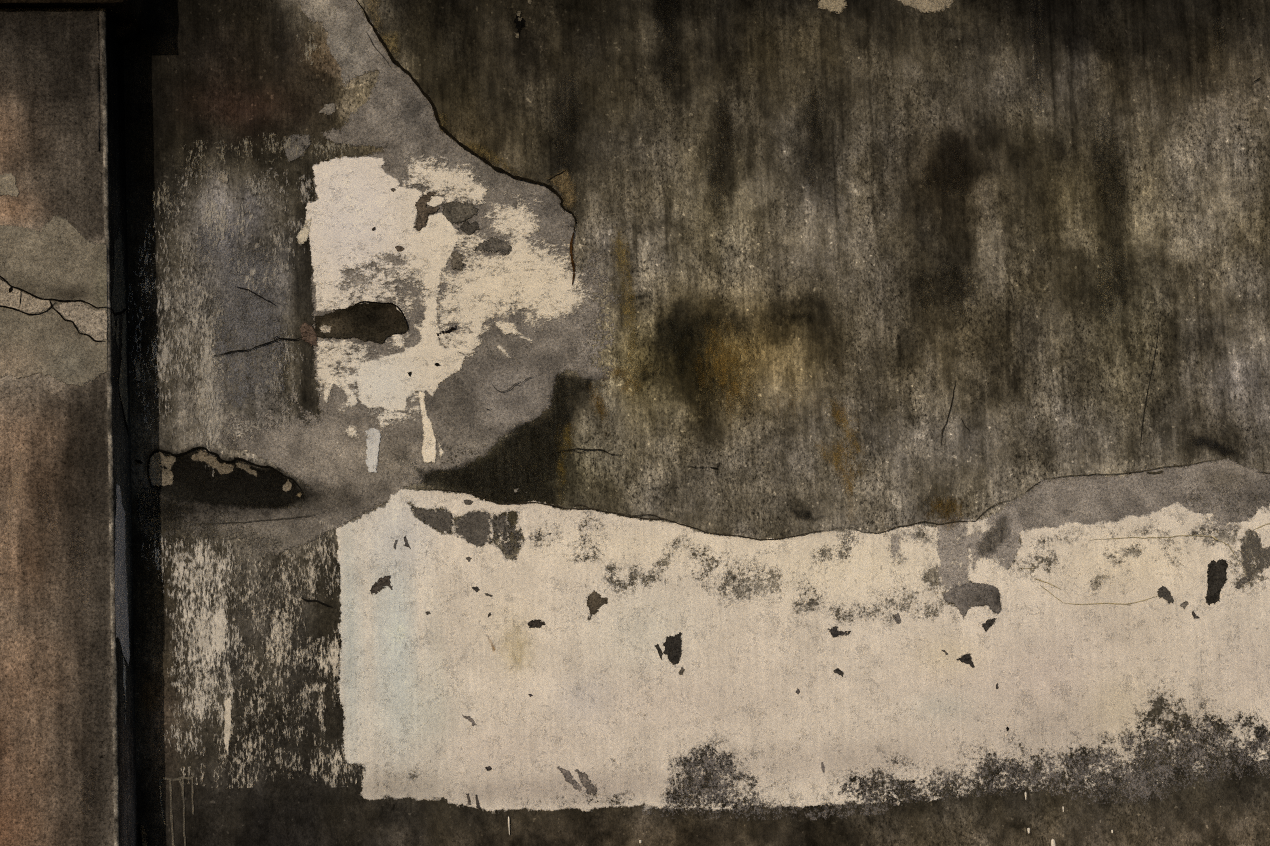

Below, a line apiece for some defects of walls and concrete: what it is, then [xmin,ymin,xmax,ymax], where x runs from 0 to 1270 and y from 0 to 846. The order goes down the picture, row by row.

peeling [810,0,848,14]
peeling [898,0,953,13]
crack [356,0,576,285]
peeling [296,218,311,244]
crack [0,276,127,342]
peeling [455,510,521,556]
peeling [935,458,1270,593]
peeling [115,484,130,724]
spalling [1205,559,1228,605]
spalling [663,632,682,665]
water stain [223,697,232,754]
water stain [159,776,195,846]